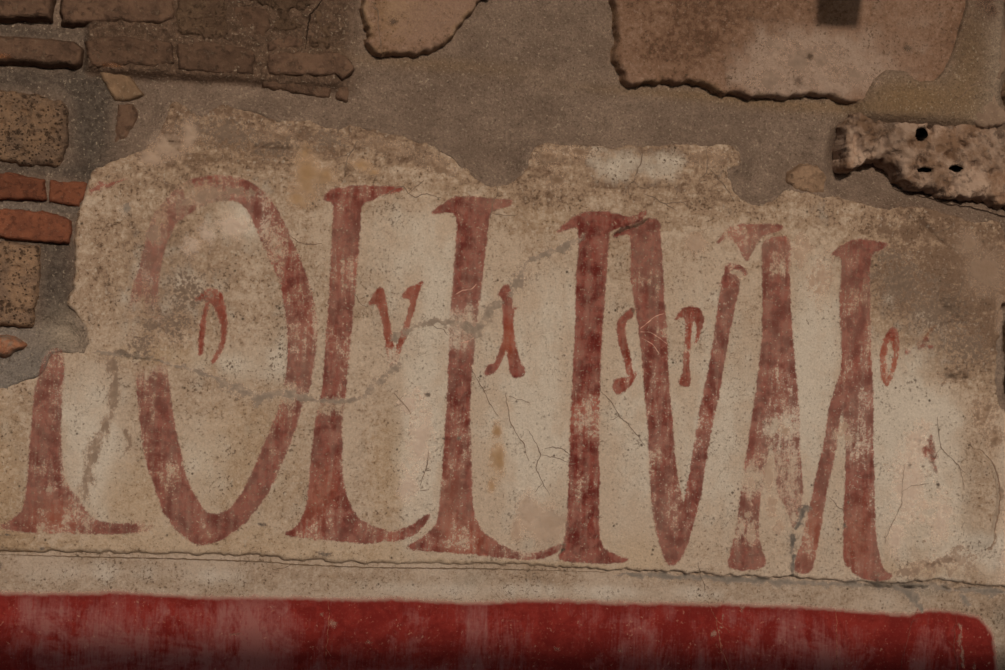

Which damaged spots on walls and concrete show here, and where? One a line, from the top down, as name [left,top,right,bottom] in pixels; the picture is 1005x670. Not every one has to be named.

crack [96,239,581,414]
crack [469,365,570,491]